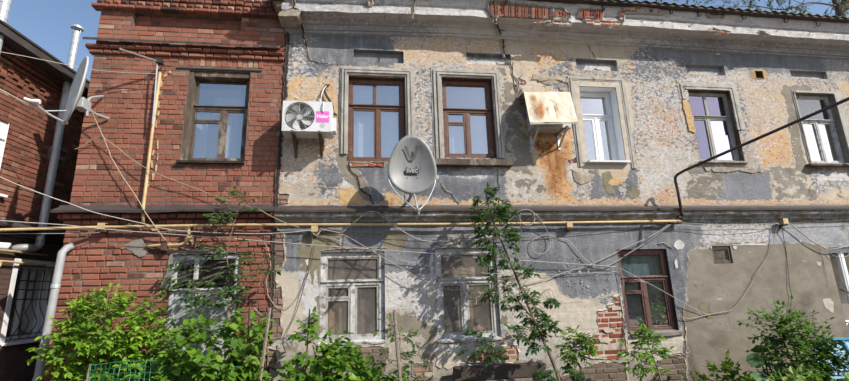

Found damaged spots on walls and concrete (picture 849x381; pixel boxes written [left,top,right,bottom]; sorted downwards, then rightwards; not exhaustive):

spalling [278,192,290,205]
peeling [338,179,364,205]
peeling [608,178,642,199]